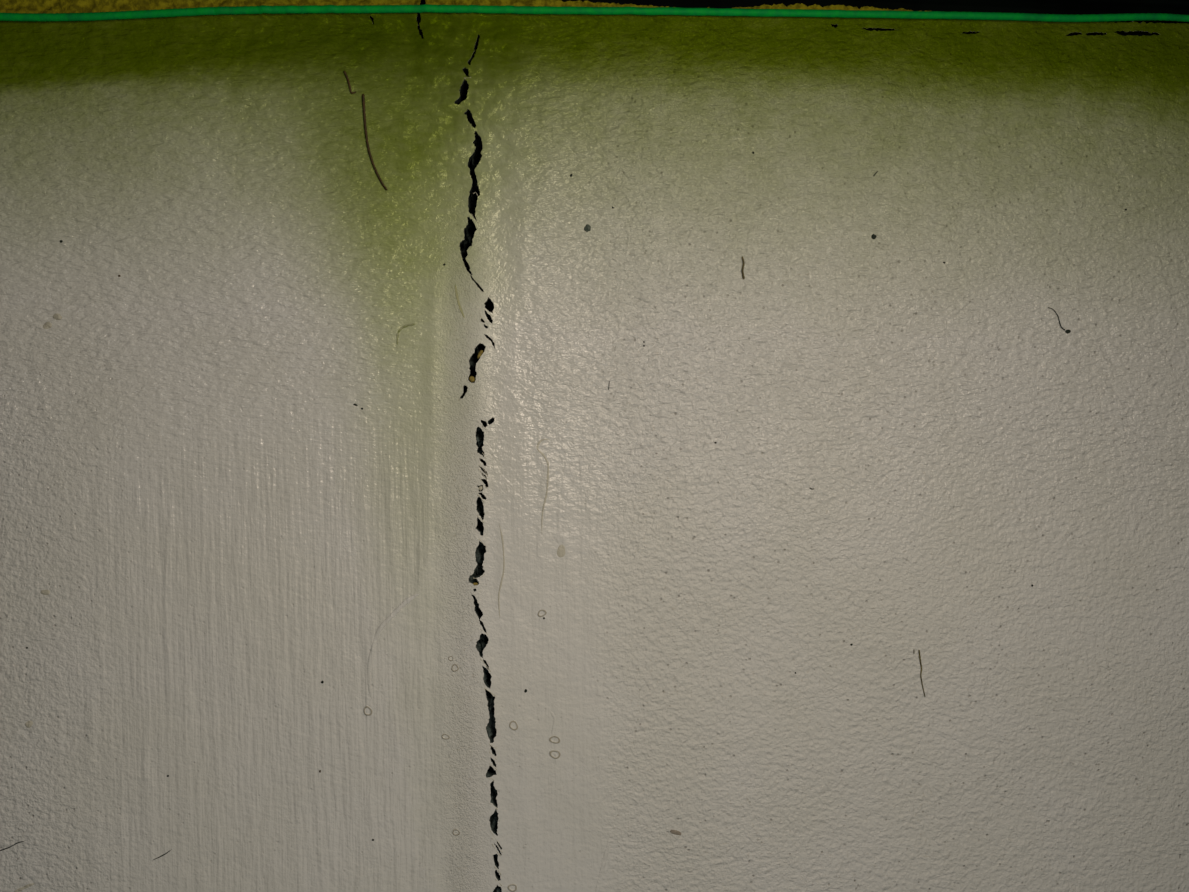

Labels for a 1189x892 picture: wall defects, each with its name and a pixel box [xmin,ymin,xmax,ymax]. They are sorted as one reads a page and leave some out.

crack [454,35,495,399]
damp [0,12,1189,110]
crack [469,417,503,892]